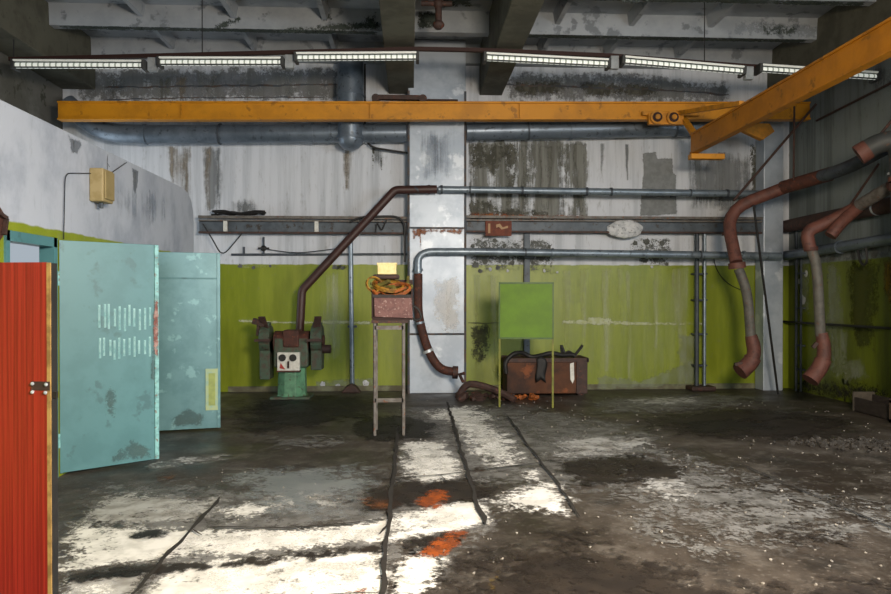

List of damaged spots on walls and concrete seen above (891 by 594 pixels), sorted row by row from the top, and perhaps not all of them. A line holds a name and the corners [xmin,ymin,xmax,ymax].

water stain [507,72,727,102]
water stain [169,147,188,192]
water stain [204,147,220,209]
water stain [469,140,588,216]
water stain [640,152,677,216]
corrosion [412,229,462,243]
water stain [471,324,490,362]